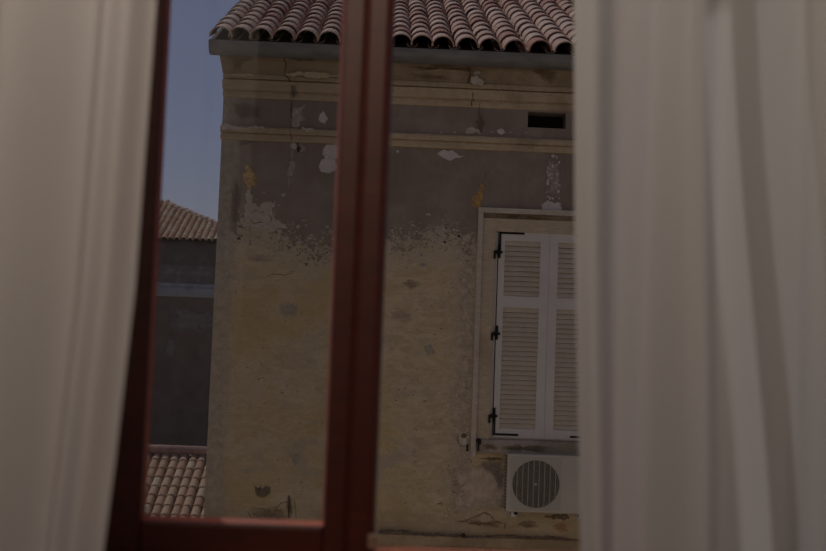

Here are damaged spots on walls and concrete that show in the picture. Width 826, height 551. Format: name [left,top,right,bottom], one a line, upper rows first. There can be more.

flaking render [319,144,337,173]
flaking render [239,164,333,240]